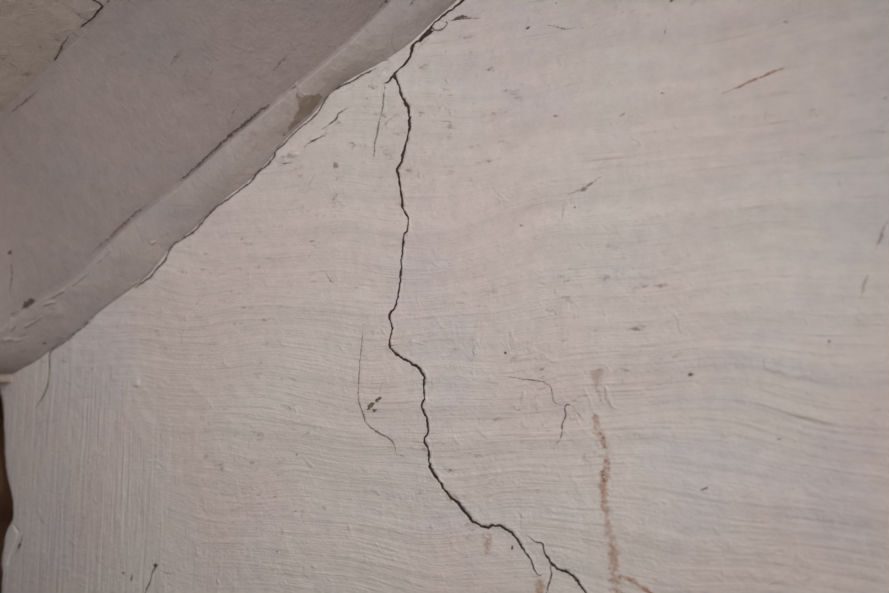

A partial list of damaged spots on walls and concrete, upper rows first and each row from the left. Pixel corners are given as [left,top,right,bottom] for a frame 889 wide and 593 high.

crack [54,0,109,61]
crack [135,0,593,593]
crack [39,317,94,403]